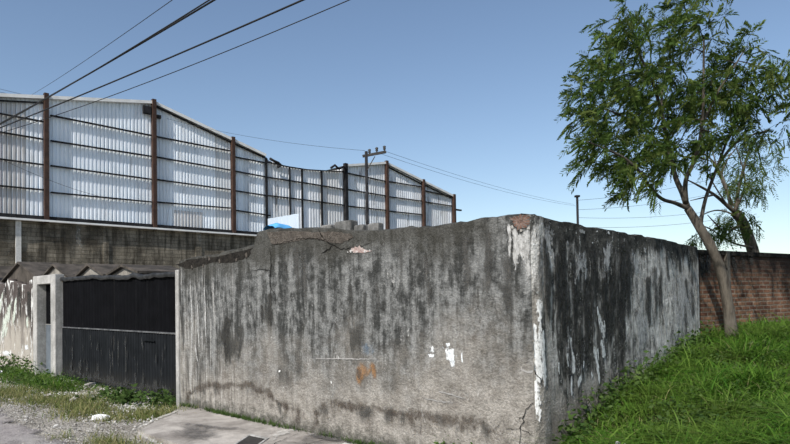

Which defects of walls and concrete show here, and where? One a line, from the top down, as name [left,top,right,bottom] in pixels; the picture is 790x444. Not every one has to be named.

water stain [190,283,214,361]
water stain [217,317,244,362]
water stain [261,293,273,325]
crack [253,231,369,294]
spalling [267,231,371,253]
peeling [445,343,463,367]
peeling [507,214,530,277]
water stain [533,238,631,422]
water stain [645,256,670,338]
water stain [678,250,695,315]
water stain [196,381,300,420]
water stain [314,401,489,432]